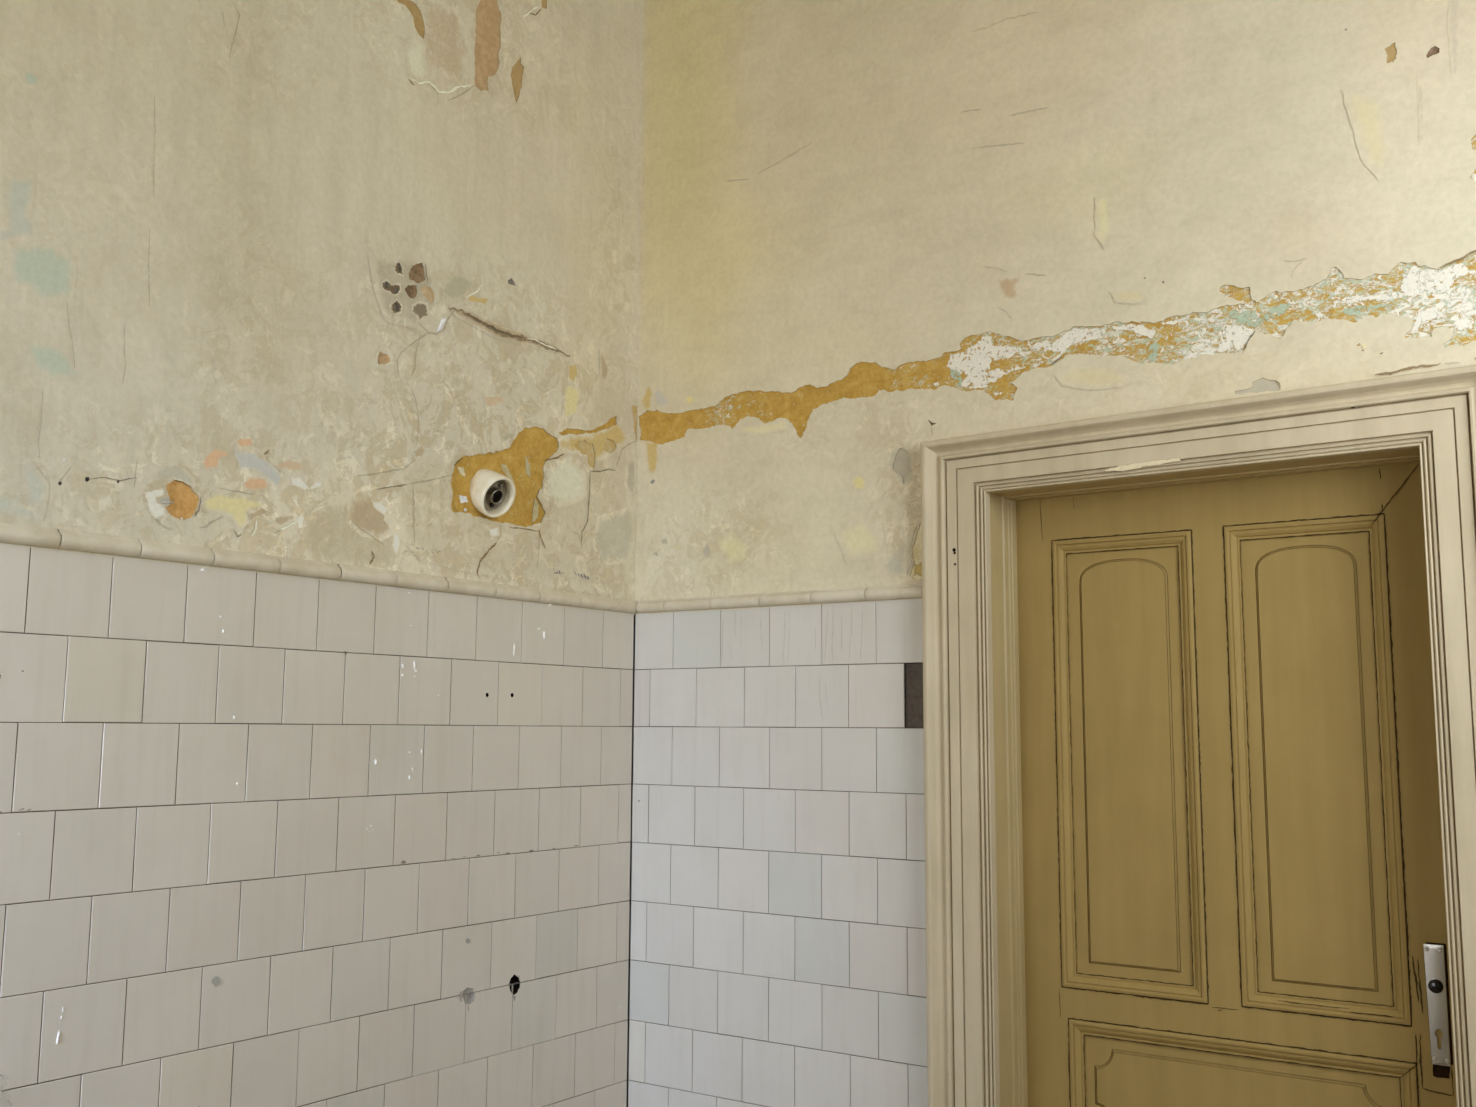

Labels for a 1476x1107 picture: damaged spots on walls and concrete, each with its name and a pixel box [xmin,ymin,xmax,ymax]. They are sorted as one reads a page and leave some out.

peeling [474,0,524,104]
peeling [1385,43,1397,63]
spalling [367,254,447,332]
crack [448,304,570,357]
peeling [451,252,1476,528]
spalling [143,480,201,522]
peeling [900,663,924,728]